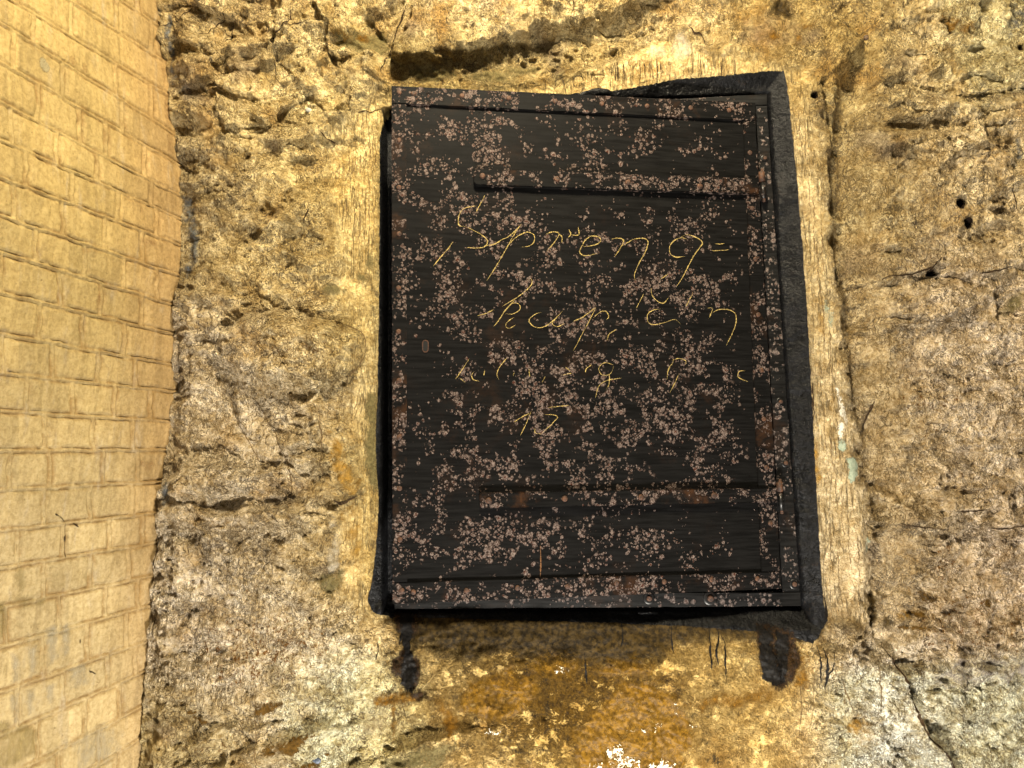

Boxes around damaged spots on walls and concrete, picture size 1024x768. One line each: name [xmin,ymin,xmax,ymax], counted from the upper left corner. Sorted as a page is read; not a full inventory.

corrosion [374,689,416,736]
crack [877,646,955,768]